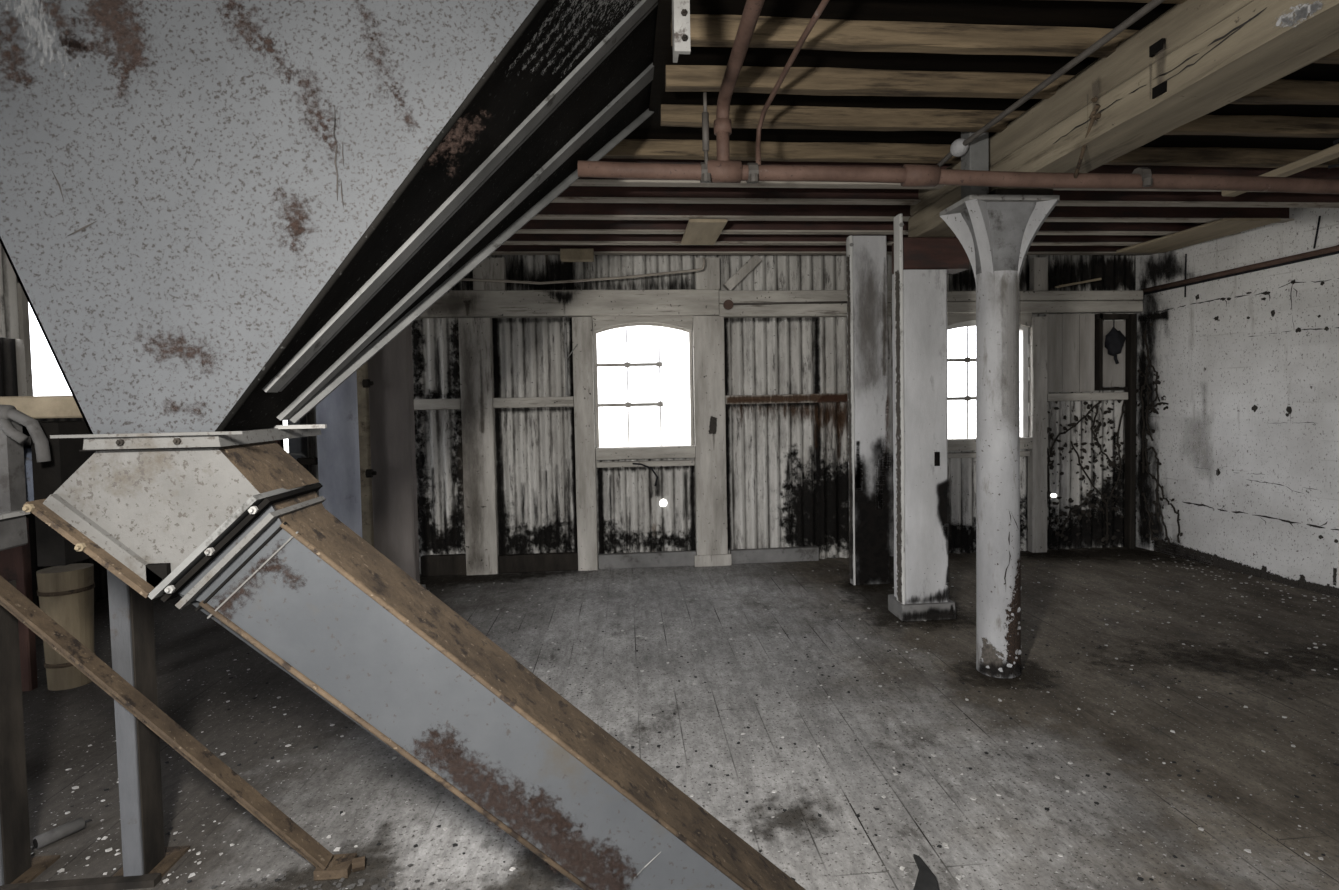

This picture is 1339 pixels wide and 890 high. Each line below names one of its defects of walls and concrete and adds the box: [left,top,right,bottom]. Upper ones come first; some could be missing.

rust [0,11,32,91]
rust [40,0,150,98]
rust [218,0,338,152]
rust [274,190,314,251]
rust [140,327,212,374]
peeling [979,558,1022,679]
rust [414,731,637,890]